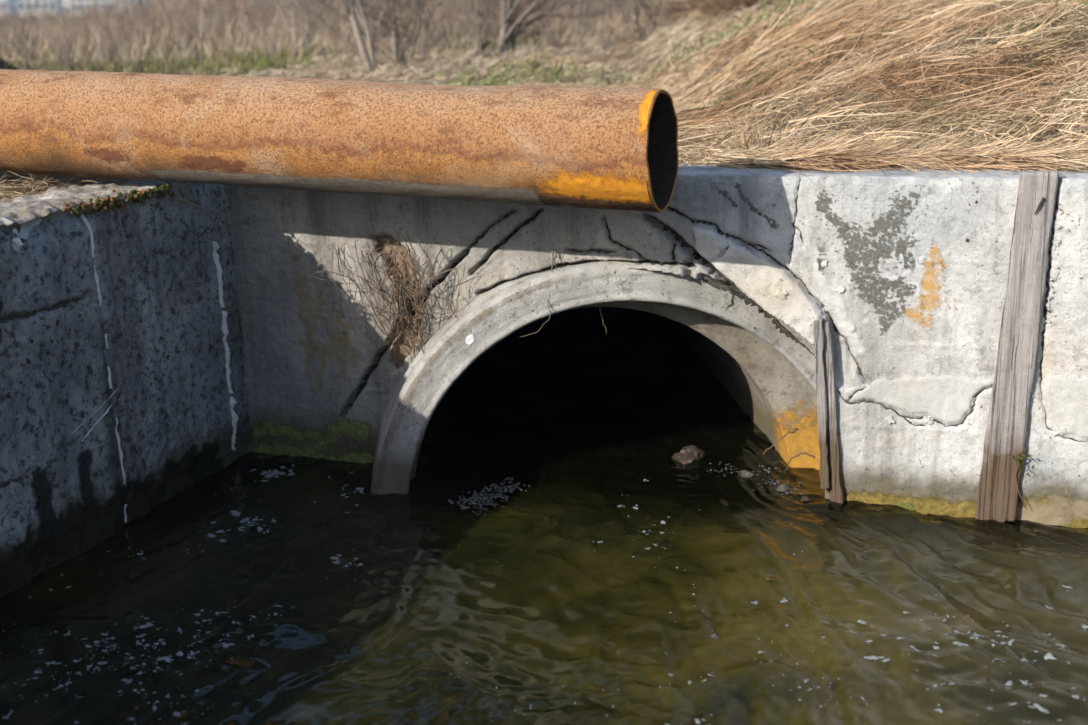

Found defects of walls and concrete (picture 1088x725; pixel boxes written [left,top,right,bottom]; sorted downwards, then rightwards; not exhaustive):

corrosion [638,89,658,141]
corrosion [84,148,130,163]
corrosion [181,156,245,173]
corrosion [539,172,650,203]
crack [0,295,88,344]
damp [94,265,102,307]
crack [347,172,991,427]
corrosion [905,247,944,323]
damp [221,311,239,450]
damp [78,417,126,505]
damp [31,466,58,534]